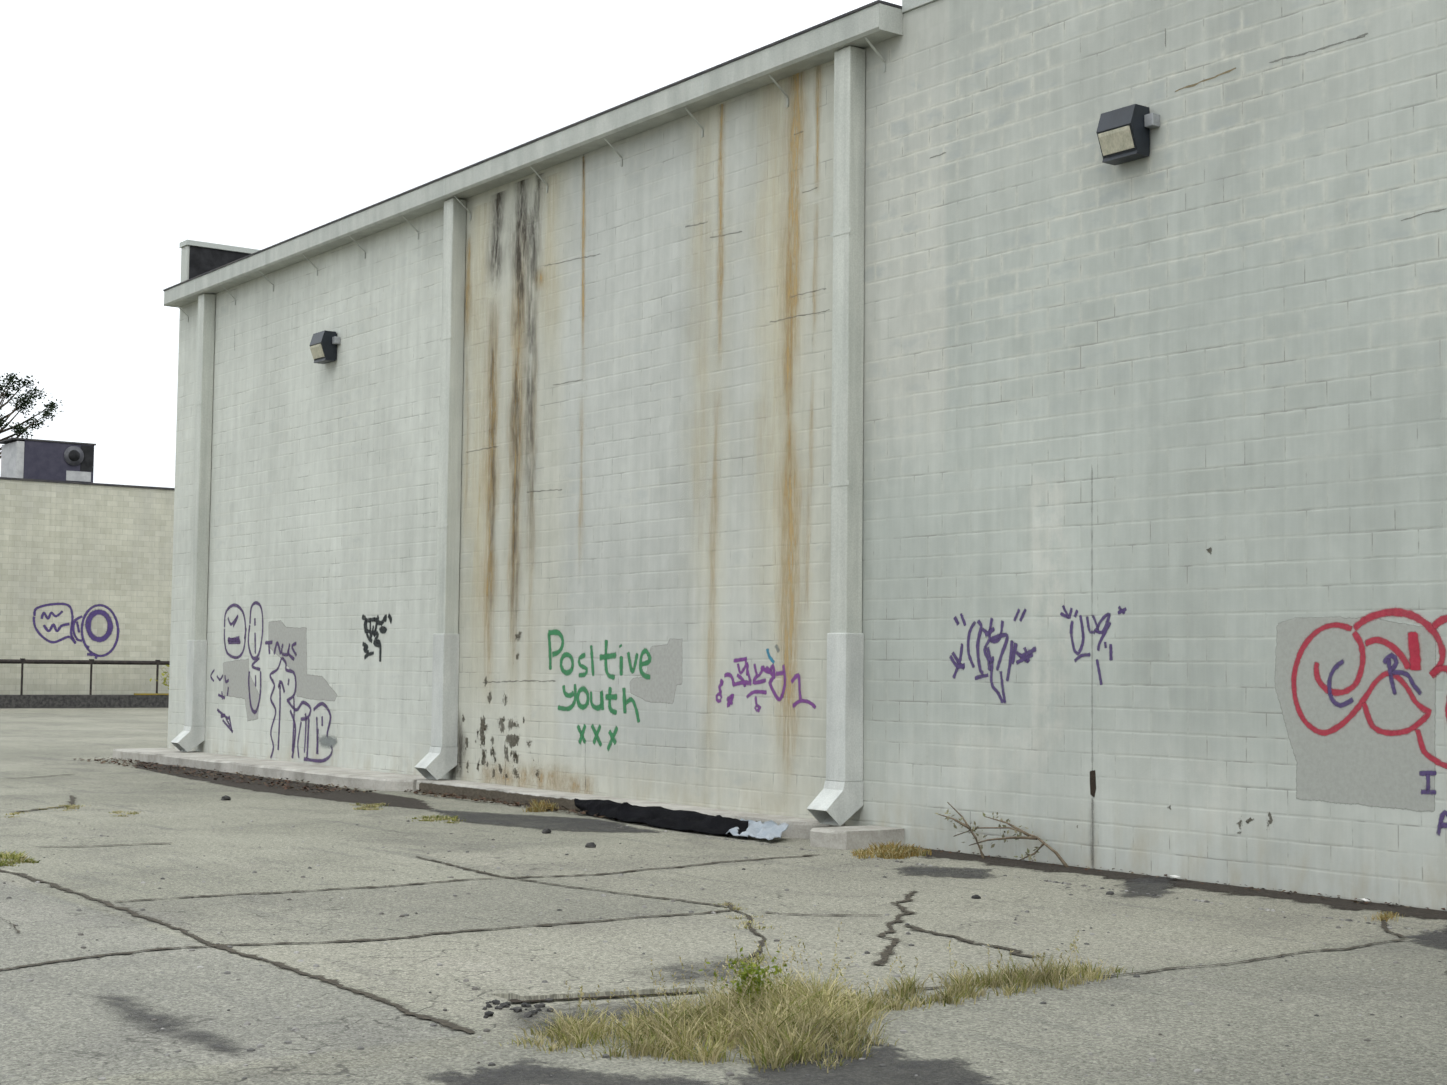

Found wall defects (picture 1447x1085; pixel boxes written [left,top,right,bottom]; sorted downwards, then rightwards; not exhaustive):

rust [786,73,819,392]
rust [486,352,497,630]
rust [512,291,521,584]
rust [783,474,796,705]